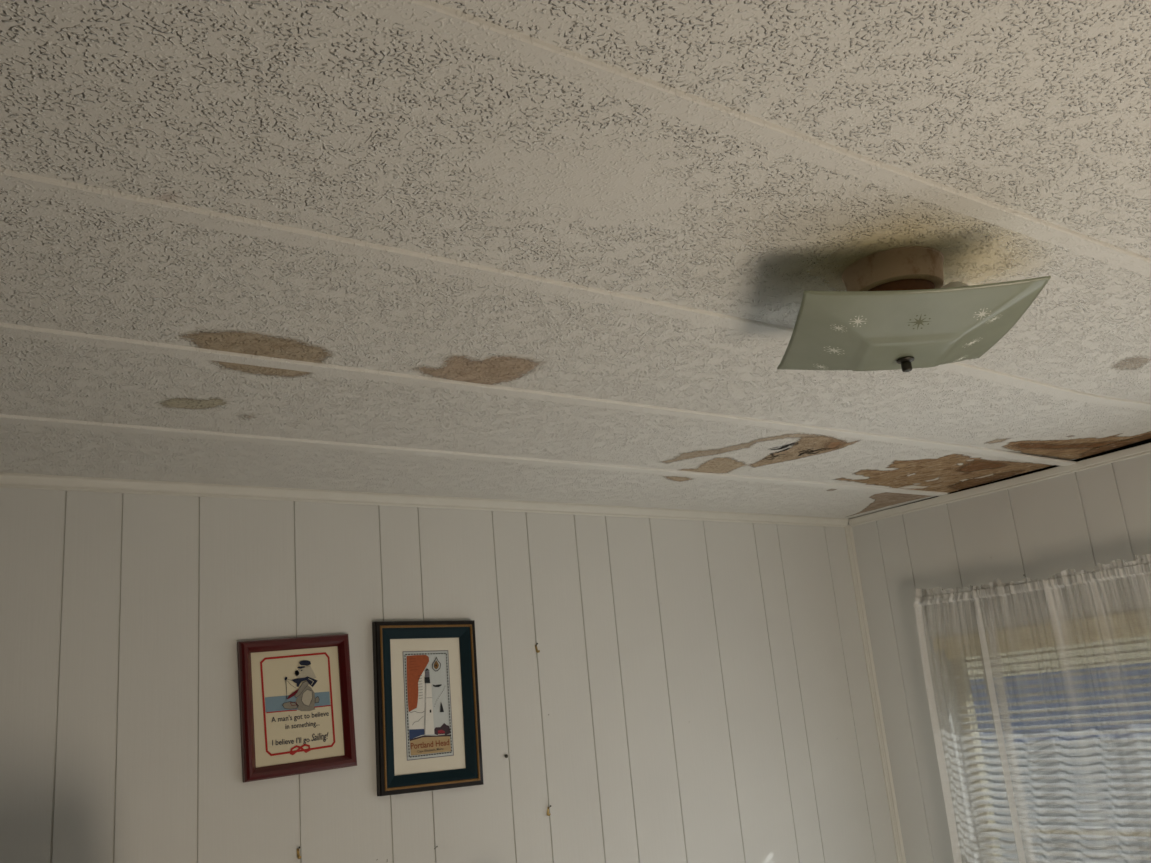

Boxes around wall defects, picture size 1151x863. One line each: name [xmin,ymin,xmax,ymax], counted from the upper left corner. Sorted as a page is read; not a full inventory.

peeling [834,431,1151,516]